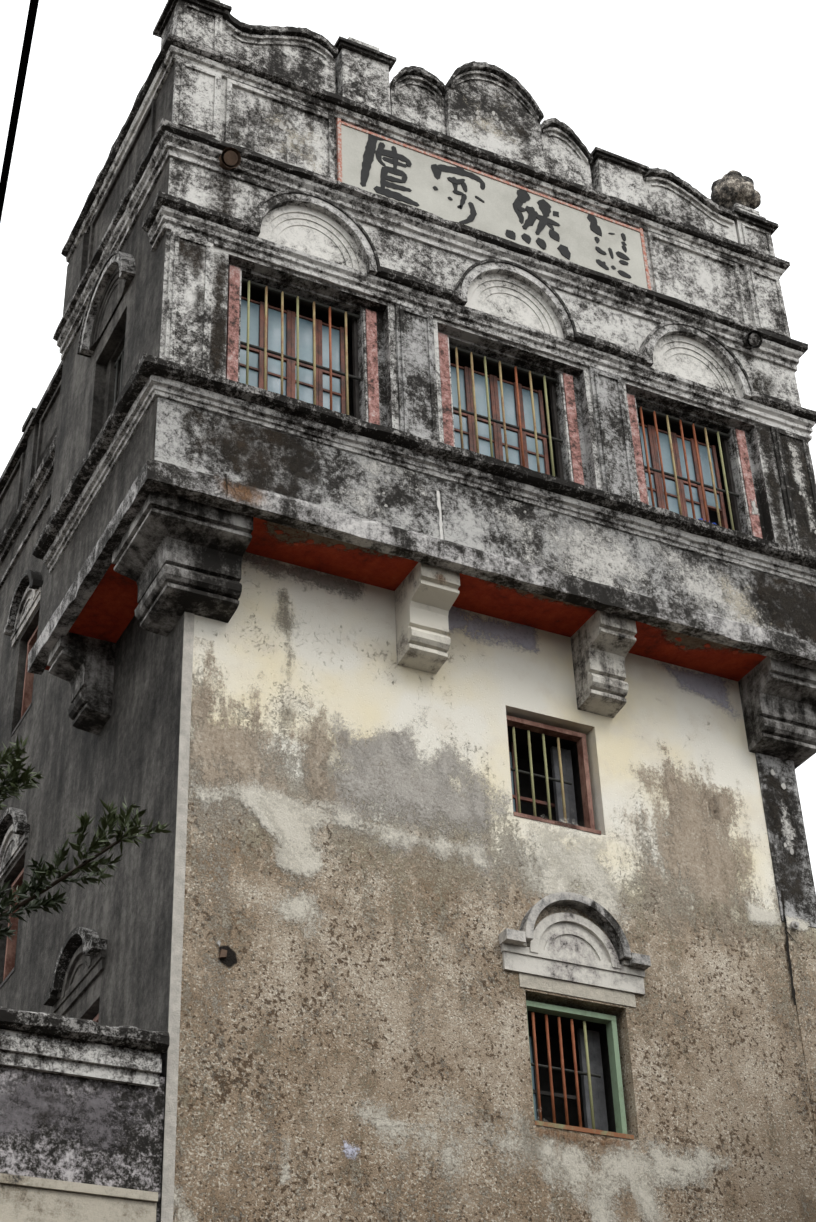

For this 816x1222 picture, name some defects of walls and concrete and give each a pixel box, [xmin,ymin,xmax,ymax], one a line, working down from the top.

leakage [512,125,537,164]
leakage [250,194,377,276]
leakage [180,405,321,499]
leakage [758,429,816,551]
leakage [277,592,292,635]
leakage [242,552,364,599]
leakage [448,606,538,651]
leakage [752,571,816,642]
leakage [189,642,344,811]
leakage [666,667,731,711]
leakage [624,747,805,947]
leakage [519,831,632,962]